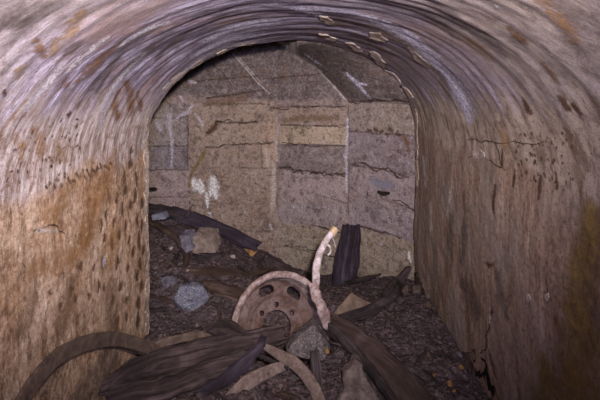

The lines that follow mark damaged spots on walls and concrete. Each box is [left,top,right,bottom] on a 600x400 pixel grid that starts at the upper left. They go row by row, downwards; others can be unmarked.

rust [34,10,85,58]
rust [61,41,122,88]
flaking render [318,32,414,100]
rust [112,82,142,119]
crack [279,162,407,179]
crack [468,138,544,171]
crack [33,224,65,234]
crack [472,308,499,400]